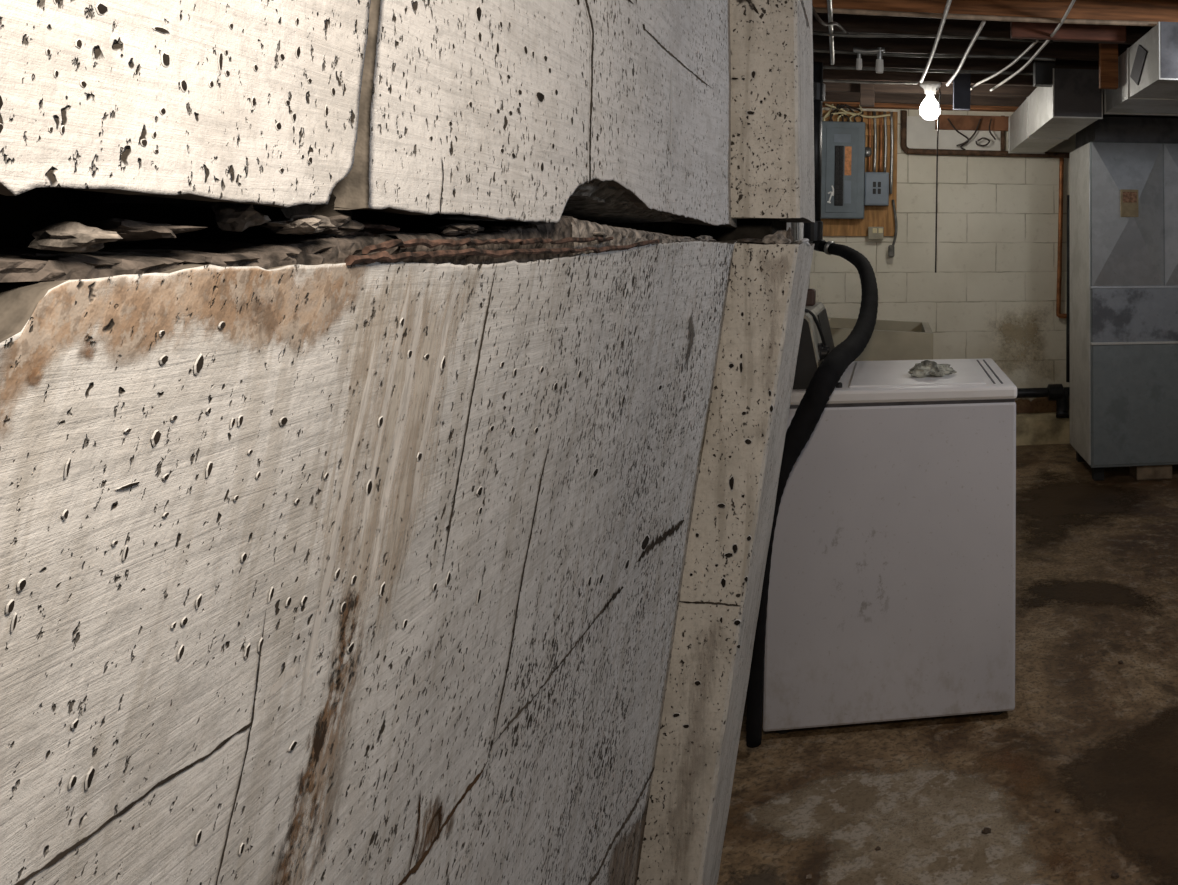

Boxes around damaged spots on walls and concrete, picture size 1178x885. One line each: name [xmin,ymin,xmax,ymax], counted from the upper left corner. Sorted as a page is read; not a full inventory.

crack [584,0,595,181]
crack [628,0,713,89]
crack [737,0,759,14]
crack [0,160,810,573]
crack [14,613,266,885]
crack [398,438,624,885]
crack [588,767,655,885]
water stain [748,760,1039,885]
water stain [1060,709,1178,885]